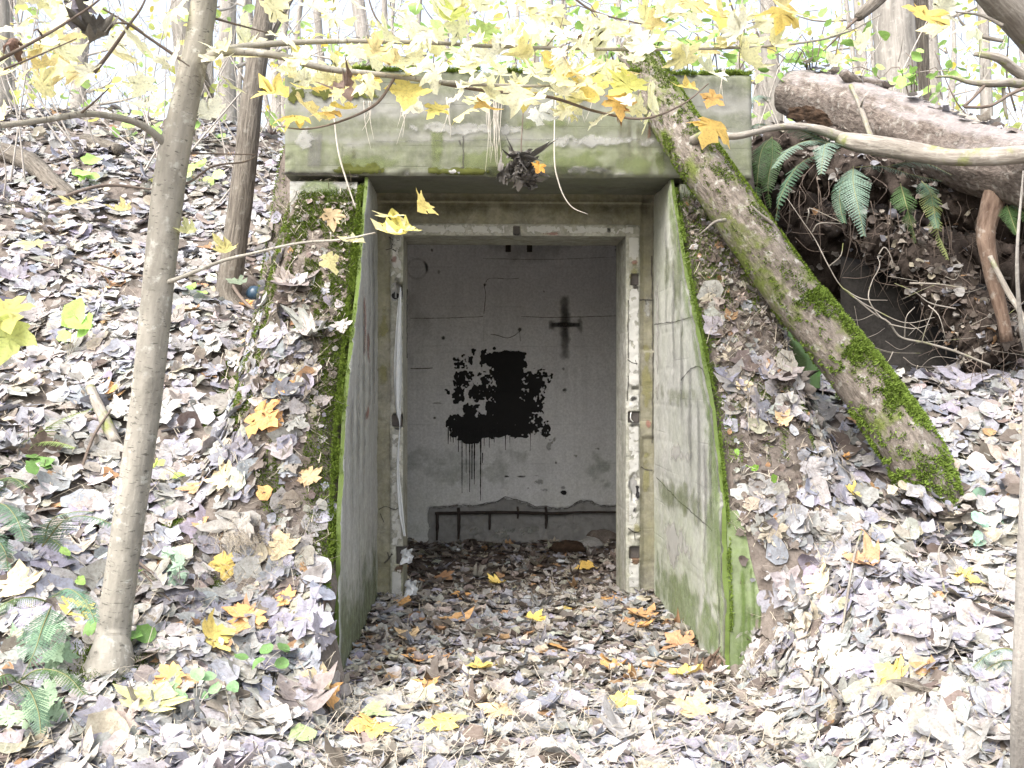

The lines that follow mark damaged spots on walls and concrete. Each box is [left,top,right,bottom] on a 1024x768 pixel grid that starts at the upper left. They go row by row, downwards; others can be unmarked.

damp [410,123,488,167]
damp [553,135,630,147]
peeling [629,289,639,409]
peeling [628,427,640,526]
spalling [428,496,616,544]
peeling [629,561,640,587]